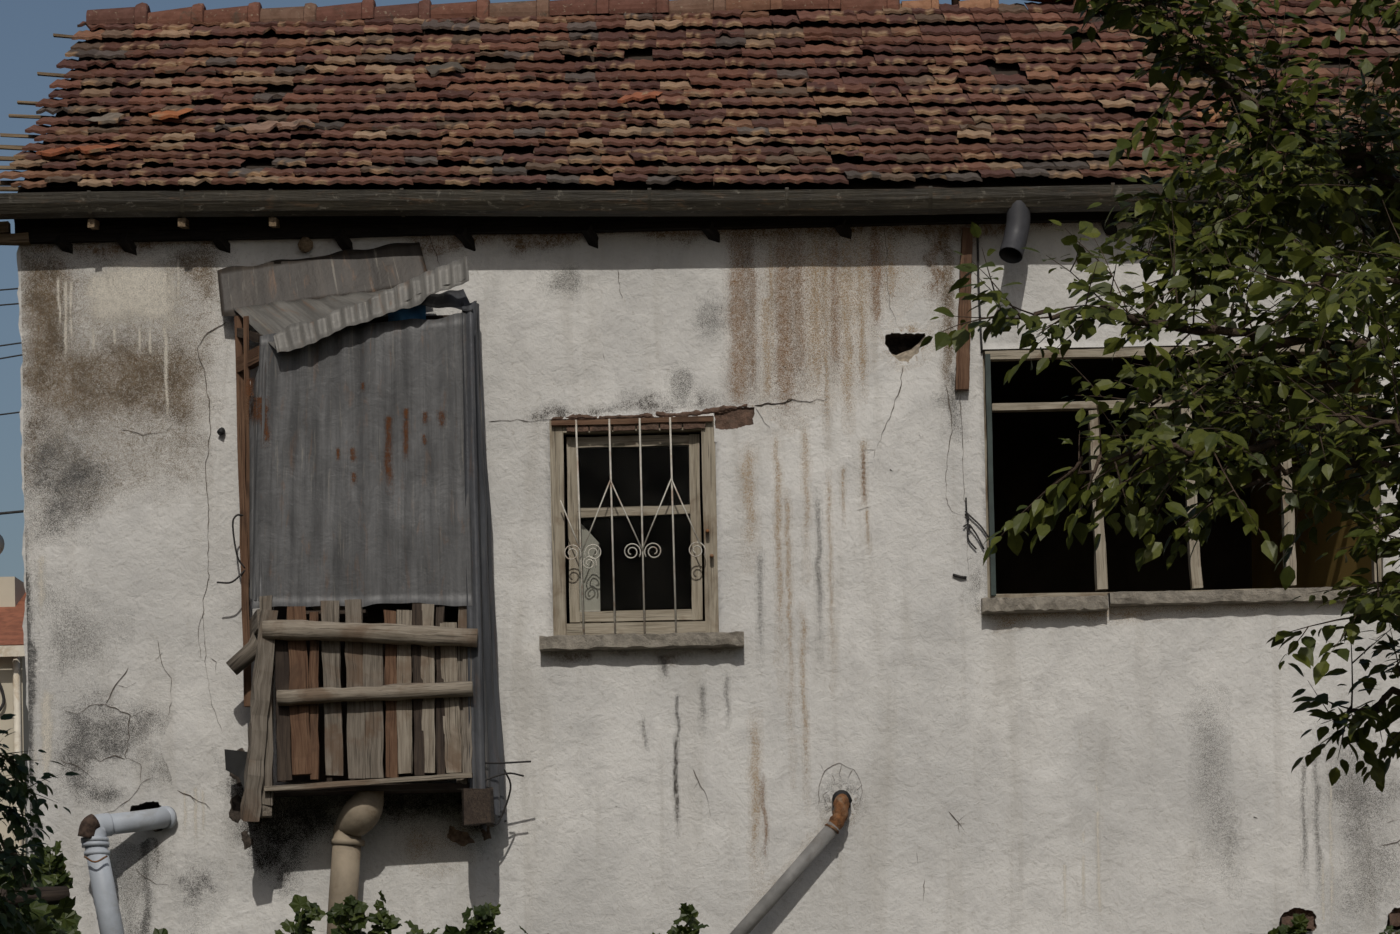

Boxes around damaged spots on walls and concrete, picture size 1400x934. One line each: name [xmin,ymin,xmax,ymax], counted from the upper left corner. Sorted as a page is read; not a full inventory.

damp [20,241,234,550]
crack [128,322,226,730]
corrosion [384,409,445,490]
spalling [551,404,755,430]
damp [530,224,1006,794]
crack [755,399,826,425]
spalling [885,333,926,363]
crack [62,643,210,813]
spalling [229,773,254,850]
damp [221,772,352,896]
damp [673,694,681,833]
damp [1300,726,1400,920]